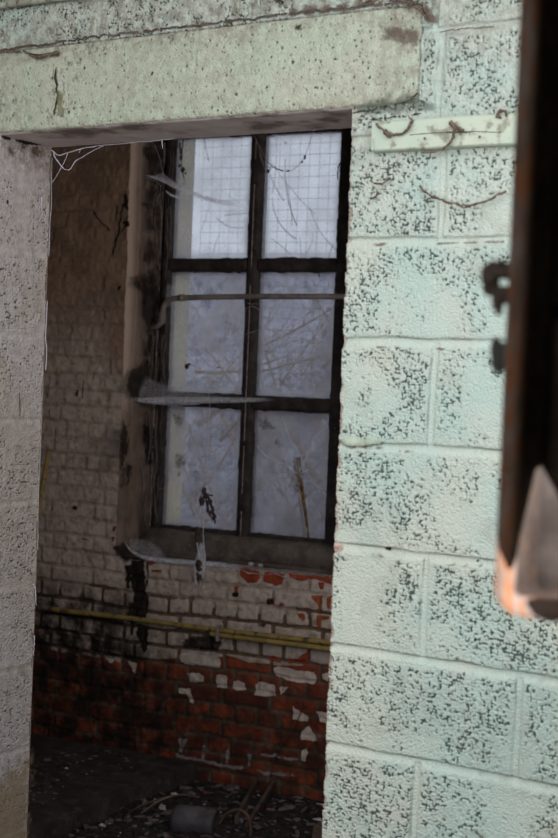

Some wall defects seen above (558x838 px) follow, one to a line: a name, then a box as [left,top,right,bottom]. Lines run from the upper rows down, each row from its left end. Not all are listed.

crack [0,0,425,115]
crack [93,190,129,256]
damp [120,423,133,486]
damp [125,557,149,653]
peeling [234,568,332,592]
peeling [187,673,204,682]
peeling [233,680,288,697]
peeling [268,651,310,664]